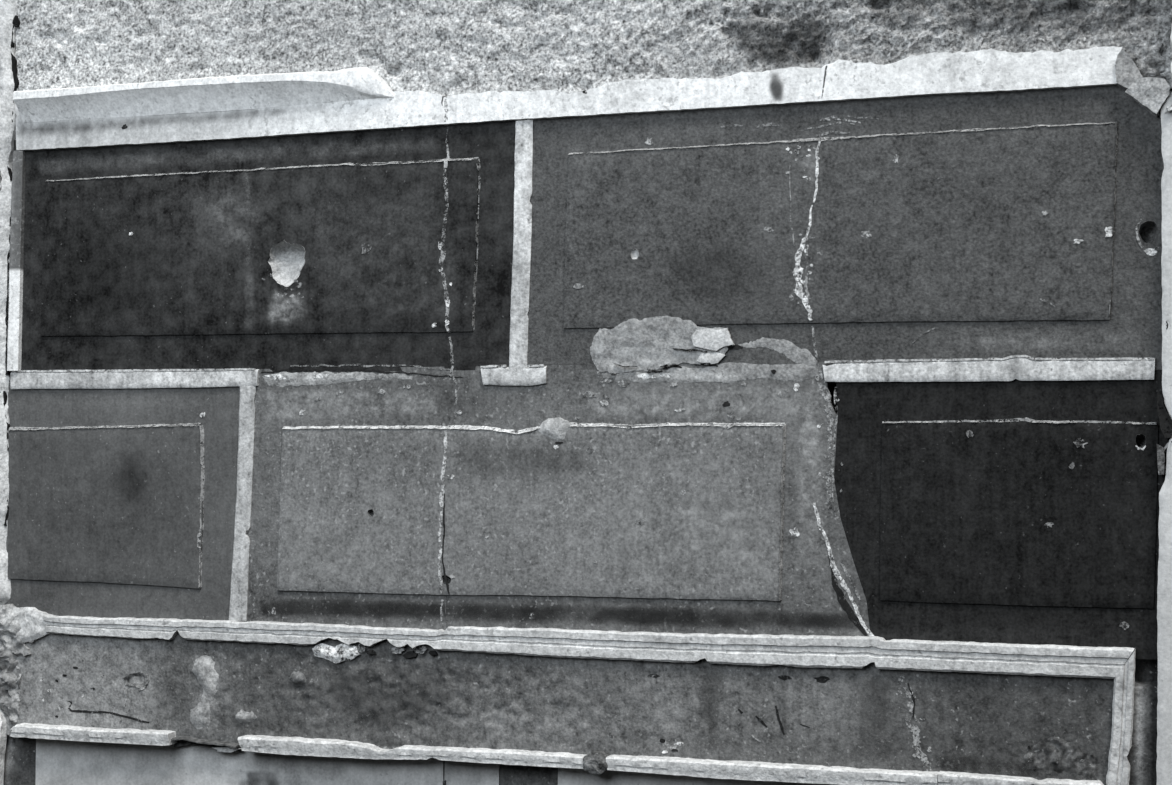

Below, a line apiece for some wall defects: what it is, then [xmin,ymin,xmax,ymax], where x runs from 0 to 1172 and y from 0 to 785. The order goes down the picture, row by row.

crack [432,95,462,626]
flaking render [582,316,819,406]
crack [763,141,874,636]
spalling [0,604,36,740]
spalling [312,643,376,663]
spalling [391,645,438,658]
leakage [248,773,277,785]